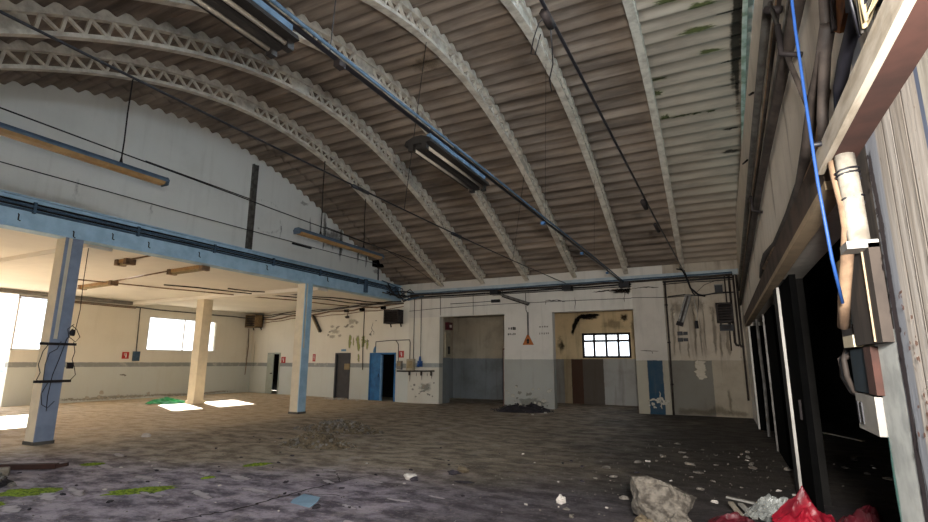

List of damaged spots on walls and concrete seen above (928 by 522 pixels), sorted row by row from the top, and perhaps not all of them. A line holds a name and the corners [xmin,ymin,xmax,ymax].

water stain [678,0,743,107]
peeling [693,360,708,380]
peeling [648,392,670,409]